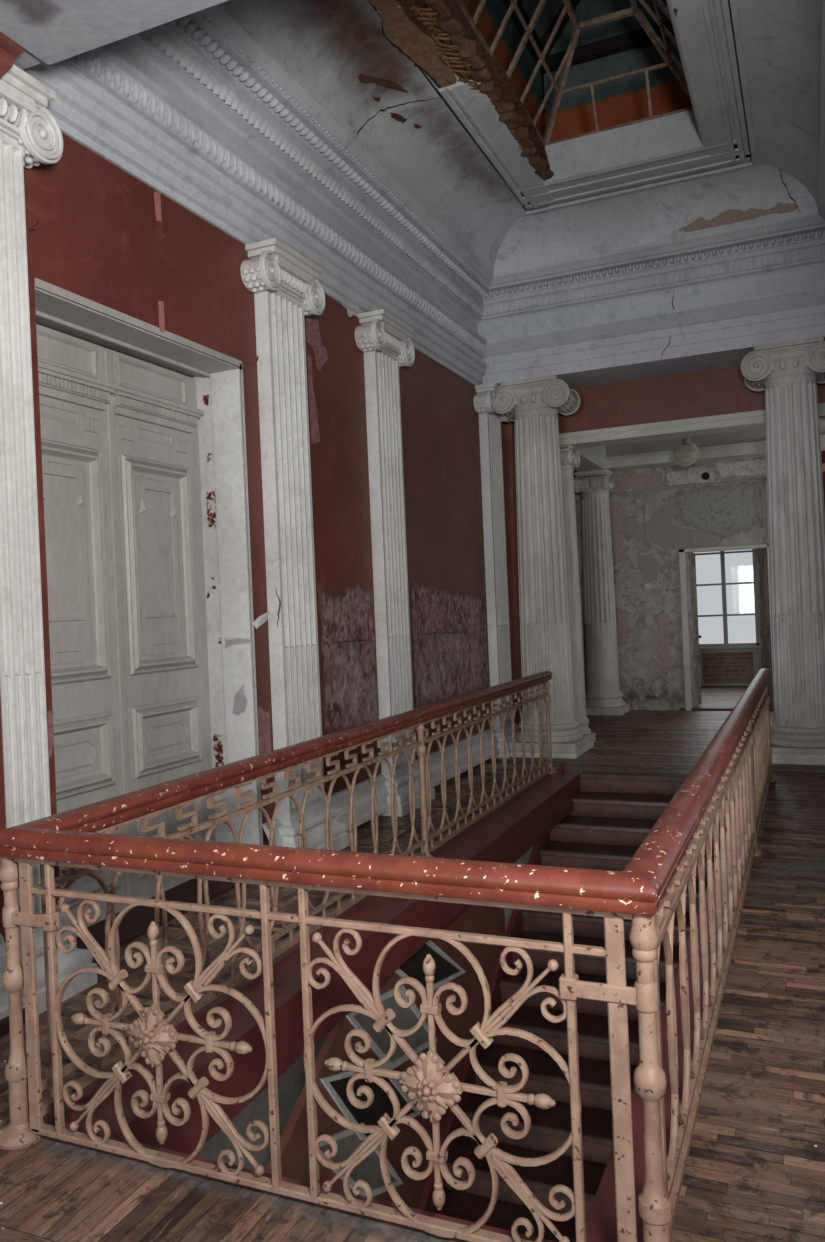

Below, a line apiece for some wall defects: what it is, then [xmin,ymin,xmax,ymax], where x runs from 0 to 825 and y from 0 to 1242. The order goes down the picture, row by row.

leakage [10,0,54,21]
flaking render [368,0,460,88]
crack [357,21,443,137]
flaking render [679,202,798,236]
peeling [664,459,766,487]
peeling [609,500,632,563]
peeling [616,608,628,647]
flaking render [702,652,754,683]